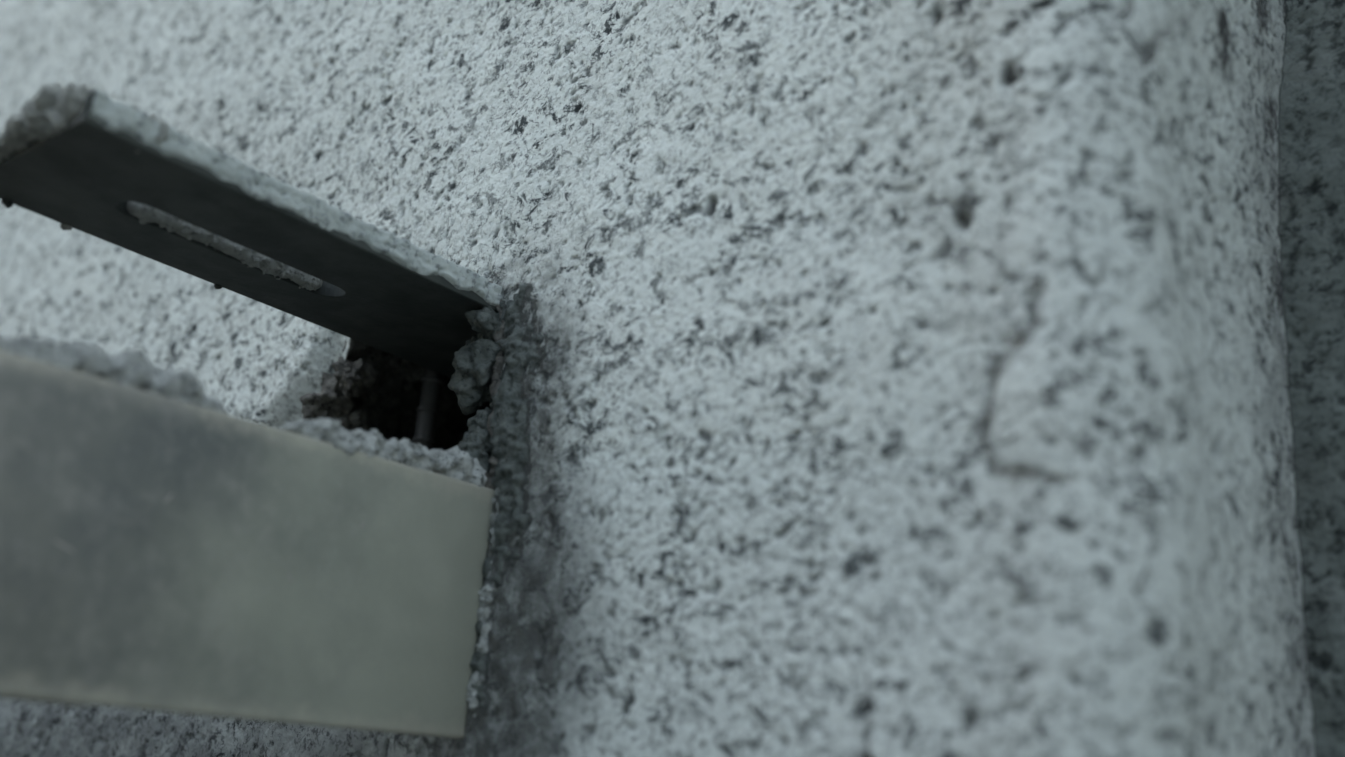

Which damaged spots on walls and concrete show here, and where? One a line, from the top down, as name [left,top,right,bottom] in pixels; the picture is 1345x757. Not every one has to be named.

spalling [299,338,425,443]
spalling [433,283,548,590]
spalling [470,614,495,717]